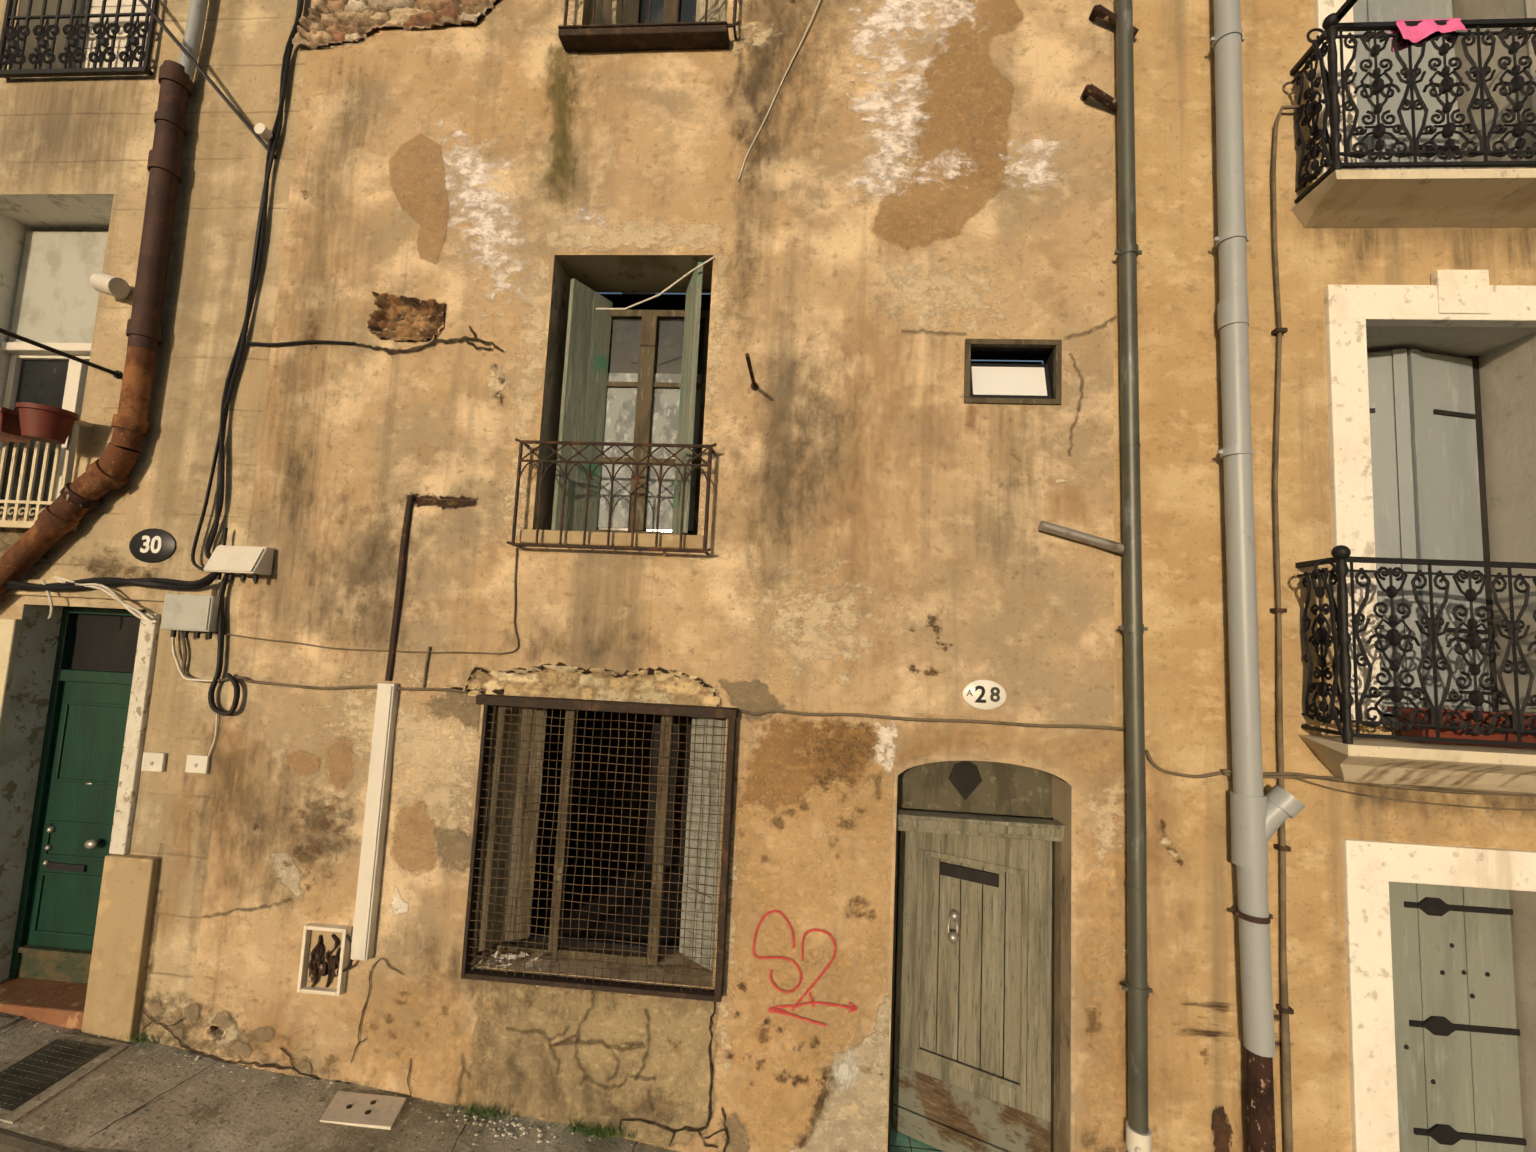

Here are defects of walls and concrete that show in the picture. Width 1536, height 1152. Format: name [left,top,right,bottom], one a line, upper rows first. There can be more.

flaking render [292,0,495,52]
damp [744,17,804,98]
damp [849,0,1058,249]
efflorescence [436,125,523,315]
spalling [367,291,446,344]
peeling [270,670,376,898]
flaking render [389,662,720,875]
damp [734,719,881,847]
crack [139,846,402,1084]
crack [456,982,730,1152]